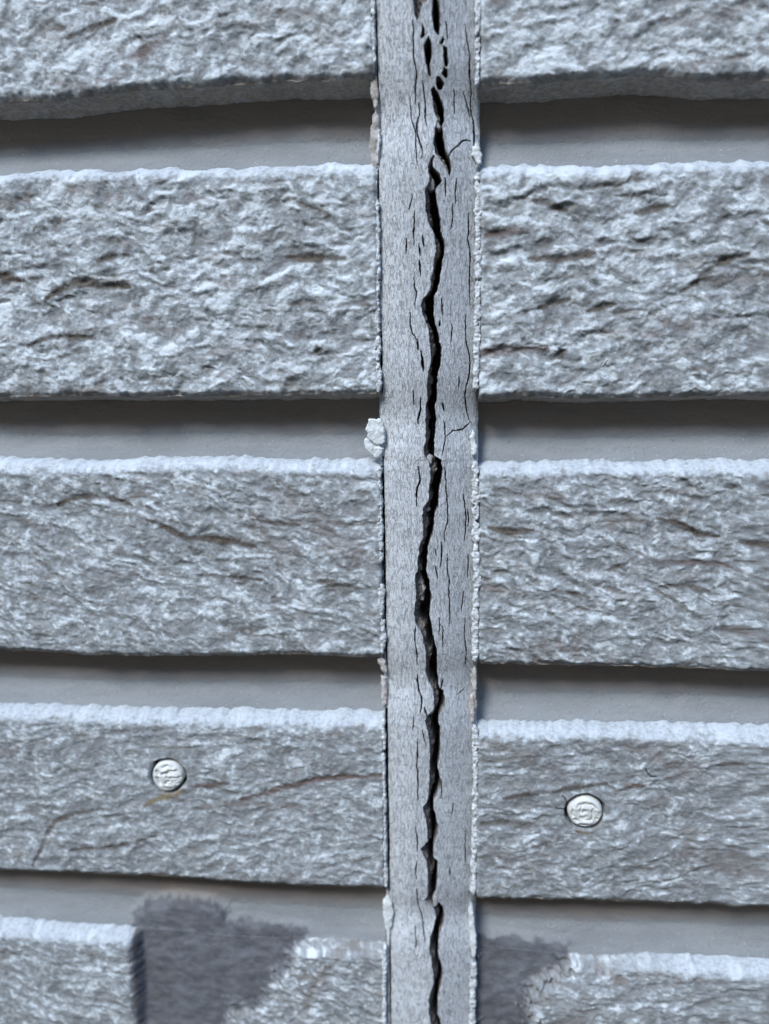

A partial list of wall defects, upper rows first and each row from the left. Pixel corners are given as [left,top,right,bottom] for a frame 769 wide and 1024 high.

crack [406,0,473,1024]